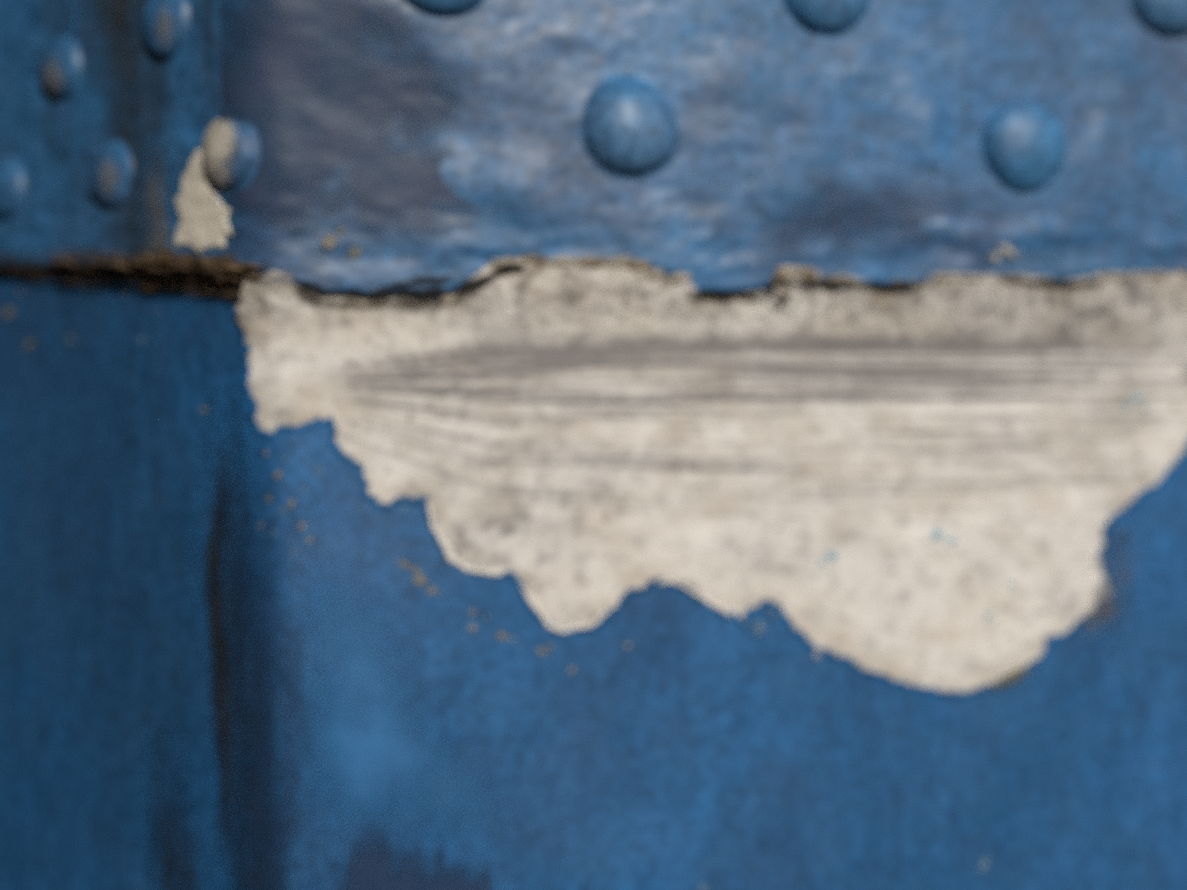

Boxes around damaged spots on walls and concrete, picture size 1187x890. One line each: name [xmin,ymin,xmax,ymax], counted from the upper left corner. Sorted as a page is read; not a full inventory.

peeling [174,118,234,253]
peeling [233,244,1187,699]
leakage [344,840,491,890]